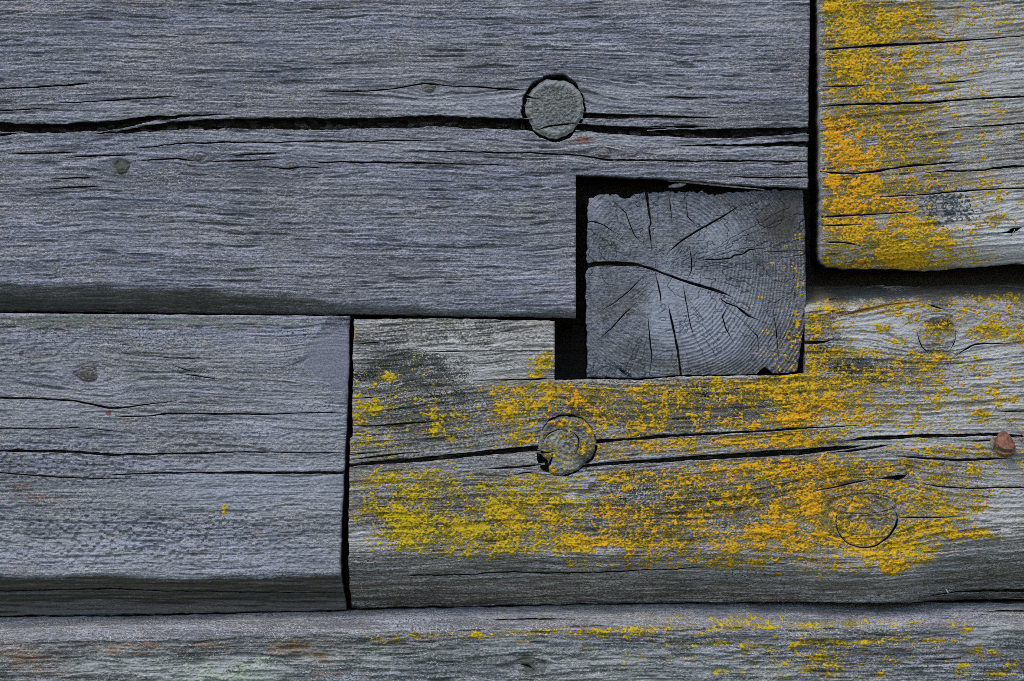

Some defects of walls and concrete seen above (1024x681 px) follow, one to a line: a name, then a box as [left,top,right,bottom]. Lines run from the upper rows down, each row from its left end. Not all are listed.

crack [0,79,1024,374]
crack [0,355,441,480]
crack [474,375,552,383]